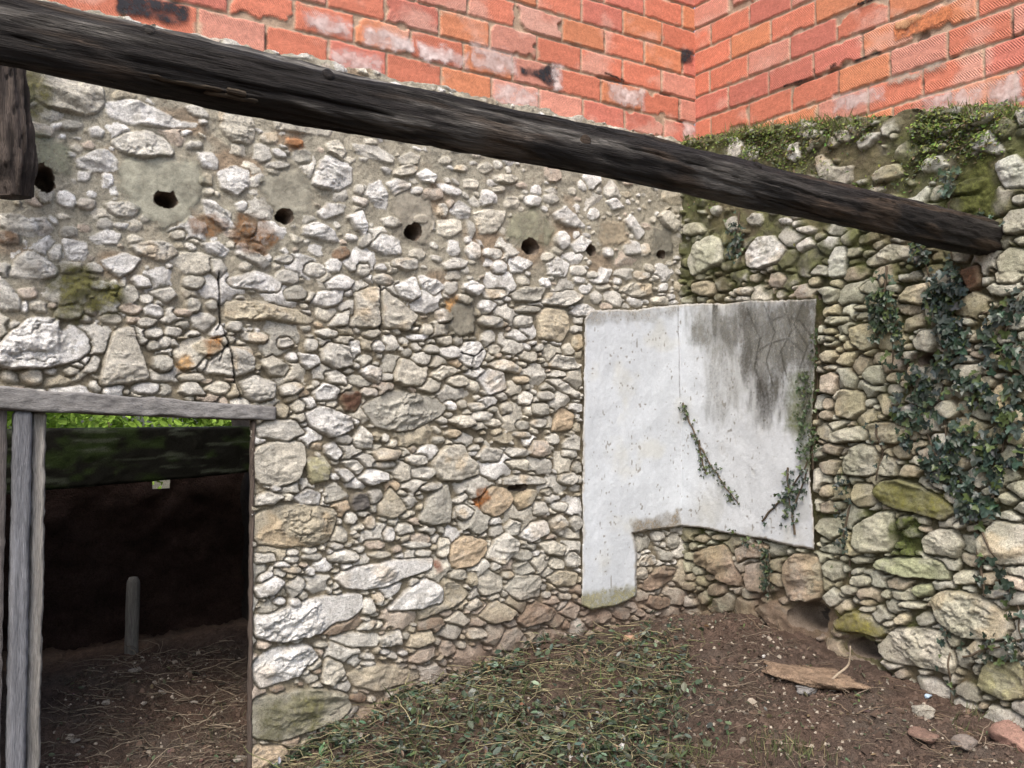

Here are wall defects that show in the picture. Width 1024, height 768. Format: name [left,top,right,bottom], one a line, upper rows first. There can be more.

crack [216,272,240,399]
damp [692,299,816,421]